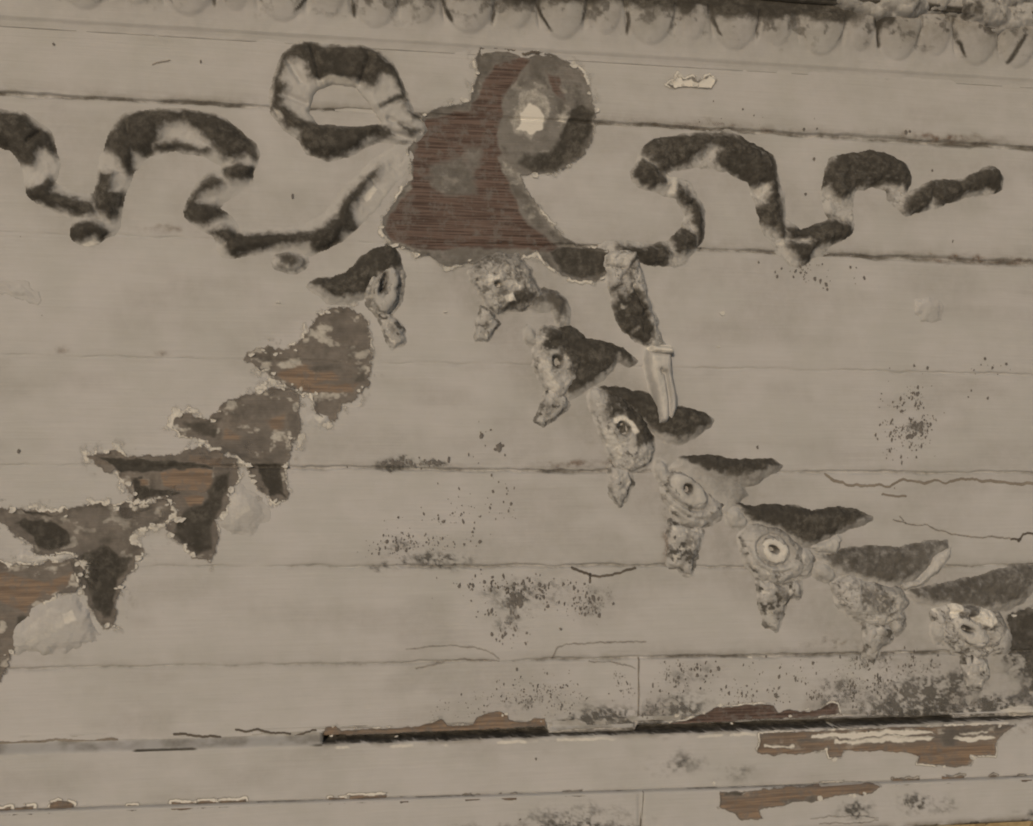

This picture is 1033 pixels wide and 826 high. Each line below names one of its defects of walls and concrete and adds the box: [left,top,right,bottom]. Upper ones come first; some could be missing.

peeling [378,47,609,285]
damp [875,385,945,465]
peeling [0,303,374,682]
crack [824,473,1033,542]
peeling [1007,607,1033,668]
peeling [324,711,546,737]
damp [433,643,1033,729]
peeling [668,701,1014,821]